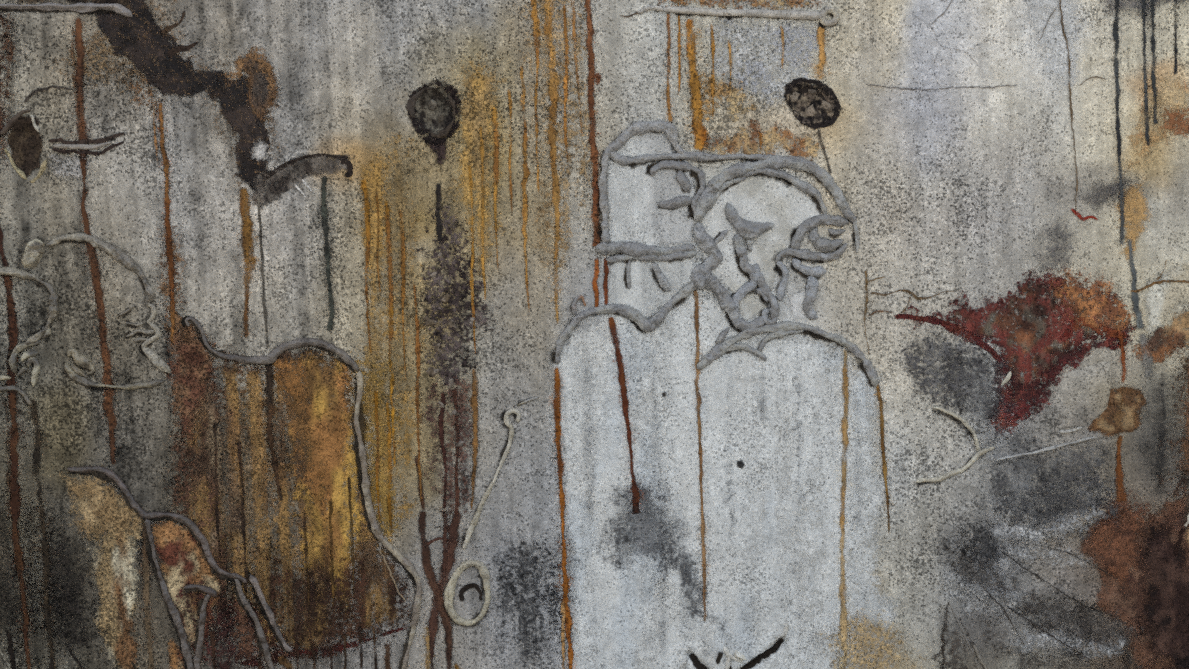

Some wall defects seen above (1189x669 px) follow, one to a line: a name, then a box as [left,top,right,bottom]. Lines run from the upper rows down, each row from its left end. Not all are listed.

corrosion [0,13,16,166]
corrosion [0,227,56,669]
water stain [17,0,353,330]
corrosion [53,18,461,669]
spalling [406,79,461,164]
water stain [487,534,575,669]
corrosion [452,0,640,514]
peeling [704,17,843,173]
corrosion [821,350,916,669]
corrosion [895,267,1189,669]
water stain [1084,0,1189,493]